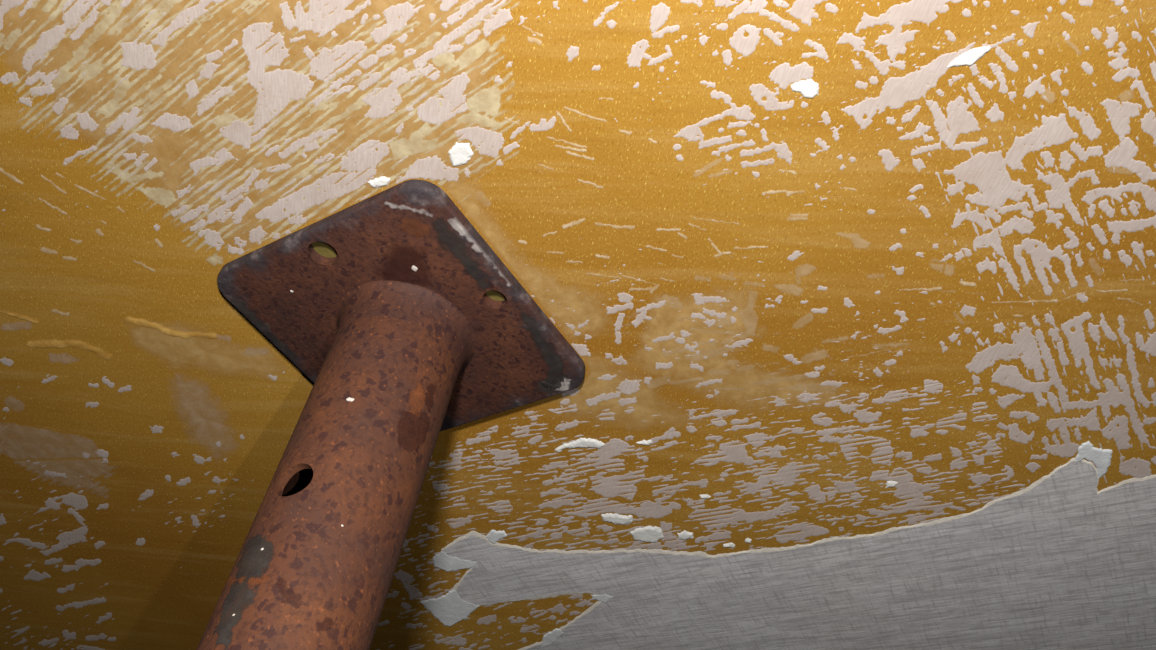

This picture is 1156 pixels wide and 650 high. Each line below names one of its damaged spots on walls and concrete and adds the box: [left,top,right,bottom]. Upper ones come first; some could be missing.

peeling [0,0,566,255]
corrosion [383,248,428,284]
peeling [378,0,1156,650]
peeling [88,376,132,393]
peeling [80,440,109,463]
peeling [132,489,154,511]
peeling [165,441,253,532]
peeling [0,460,116,650]